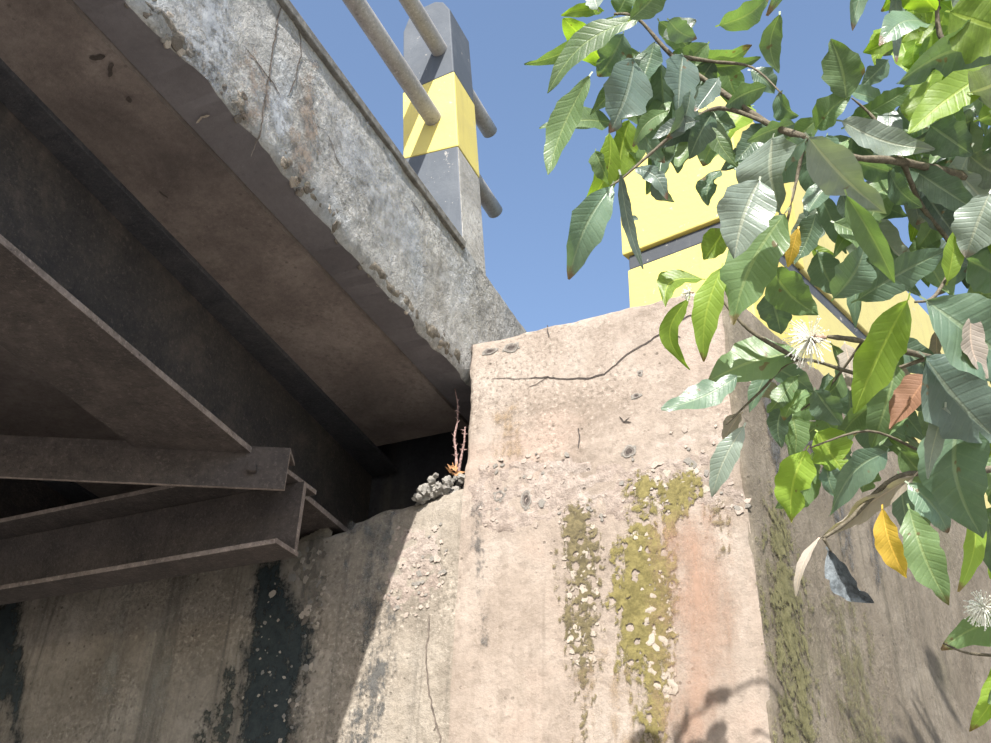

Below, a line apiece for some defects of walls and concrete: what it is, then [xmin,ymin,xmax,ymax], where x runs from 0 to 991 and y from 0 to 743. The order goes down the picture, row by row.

crack [247,6,302,156]
crack [493,315,692,387]
water stain [0,601,25,743]
water stain [193,560,316,743]
crack [425,617,442,743]
water stain [552,463,731,743]
water stain [755,427,893,743]